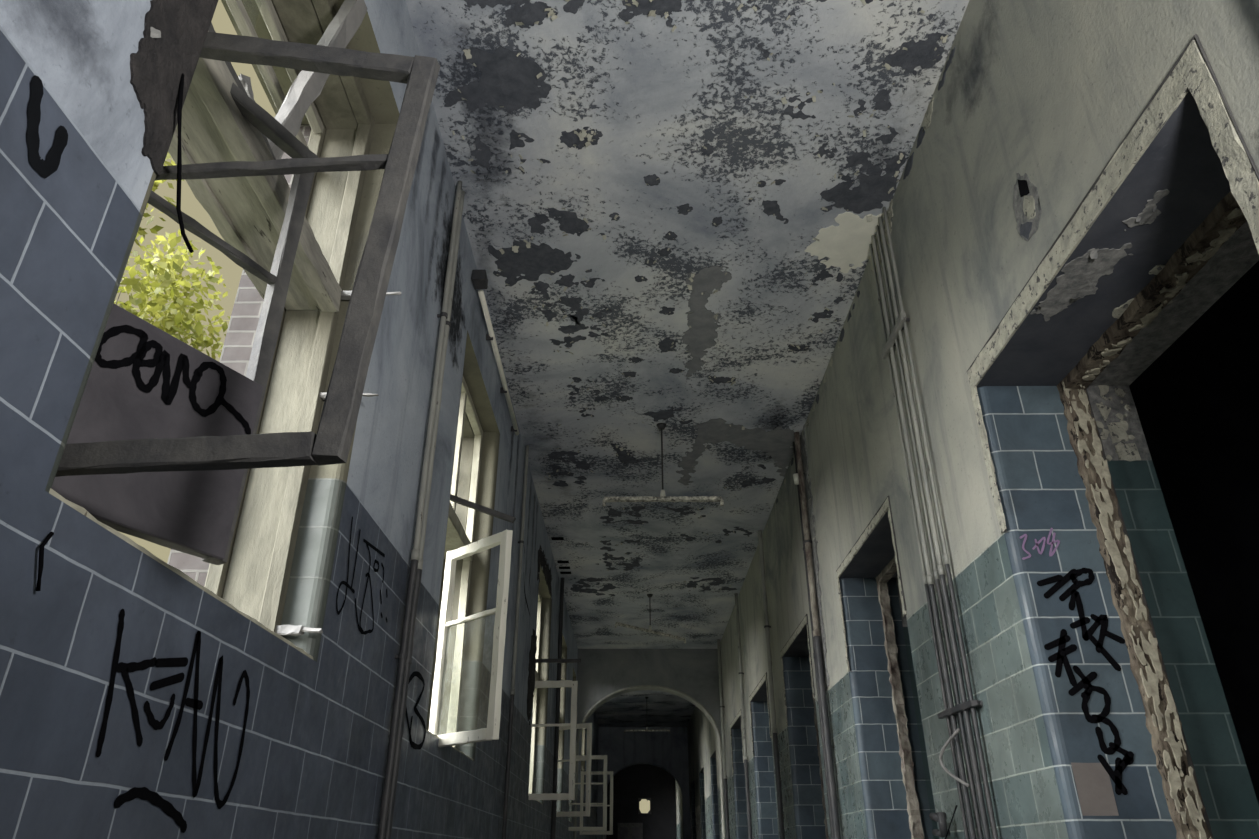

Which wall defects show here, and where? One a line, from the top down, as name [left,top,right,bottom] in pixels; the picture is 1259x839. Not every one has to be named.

peeling [464,0,585,29]
peeling [619,0,682,32]
spalling [130,0,218,179]
peeling [444,46,552,114]
peeling [452,130,551,174]
peeling [560,127,603,150]
peeling [488,208,620,354]
peeling [635,231,677,282]
peeling [1030,189,1169,321]
peeling [642,32,956,694]
peeling [570,505,648,597]
peeling [1062,208,1244,839]